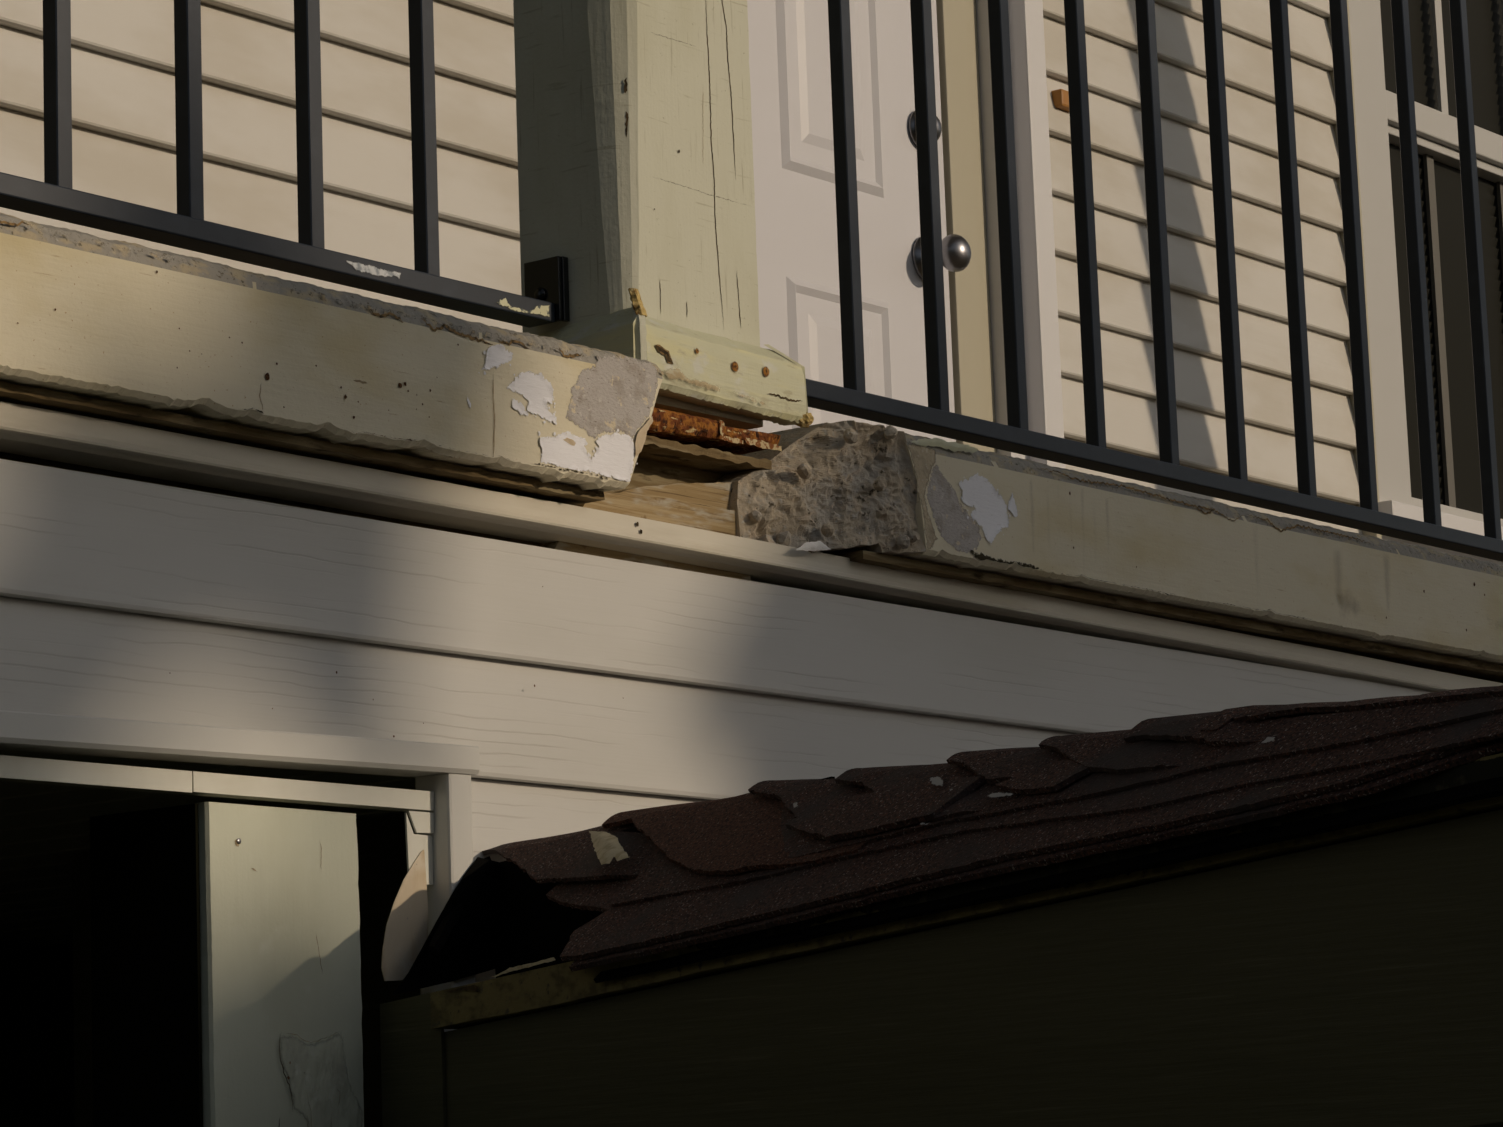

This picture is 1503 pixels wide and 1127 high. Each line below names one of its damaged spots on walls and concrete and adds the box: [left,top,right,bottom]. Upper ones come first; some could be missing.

crack [0,219,29,227]
peeling [566,344,718,457]
rust [720,420,782,452]
spalling [714,420,988,556]